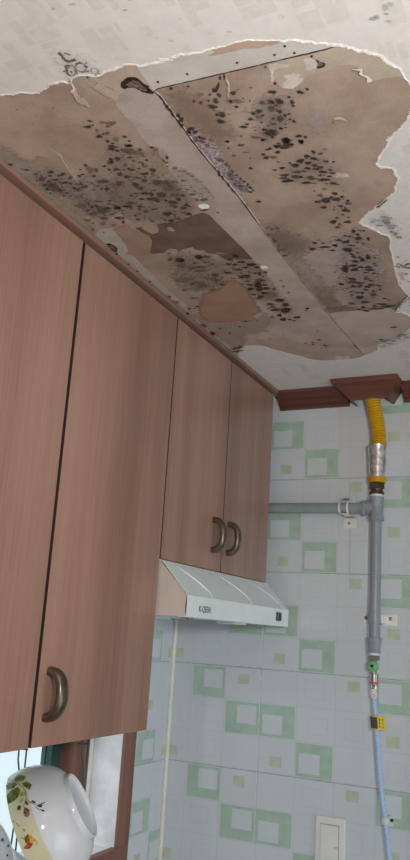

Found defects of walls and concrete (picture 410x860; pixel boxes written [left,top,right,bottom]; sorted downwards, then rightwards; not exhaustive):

damp [58,52,89,82]
damp [25,120,309,335]
spalling [186,127,254,195]
damp [193,74,406,312]